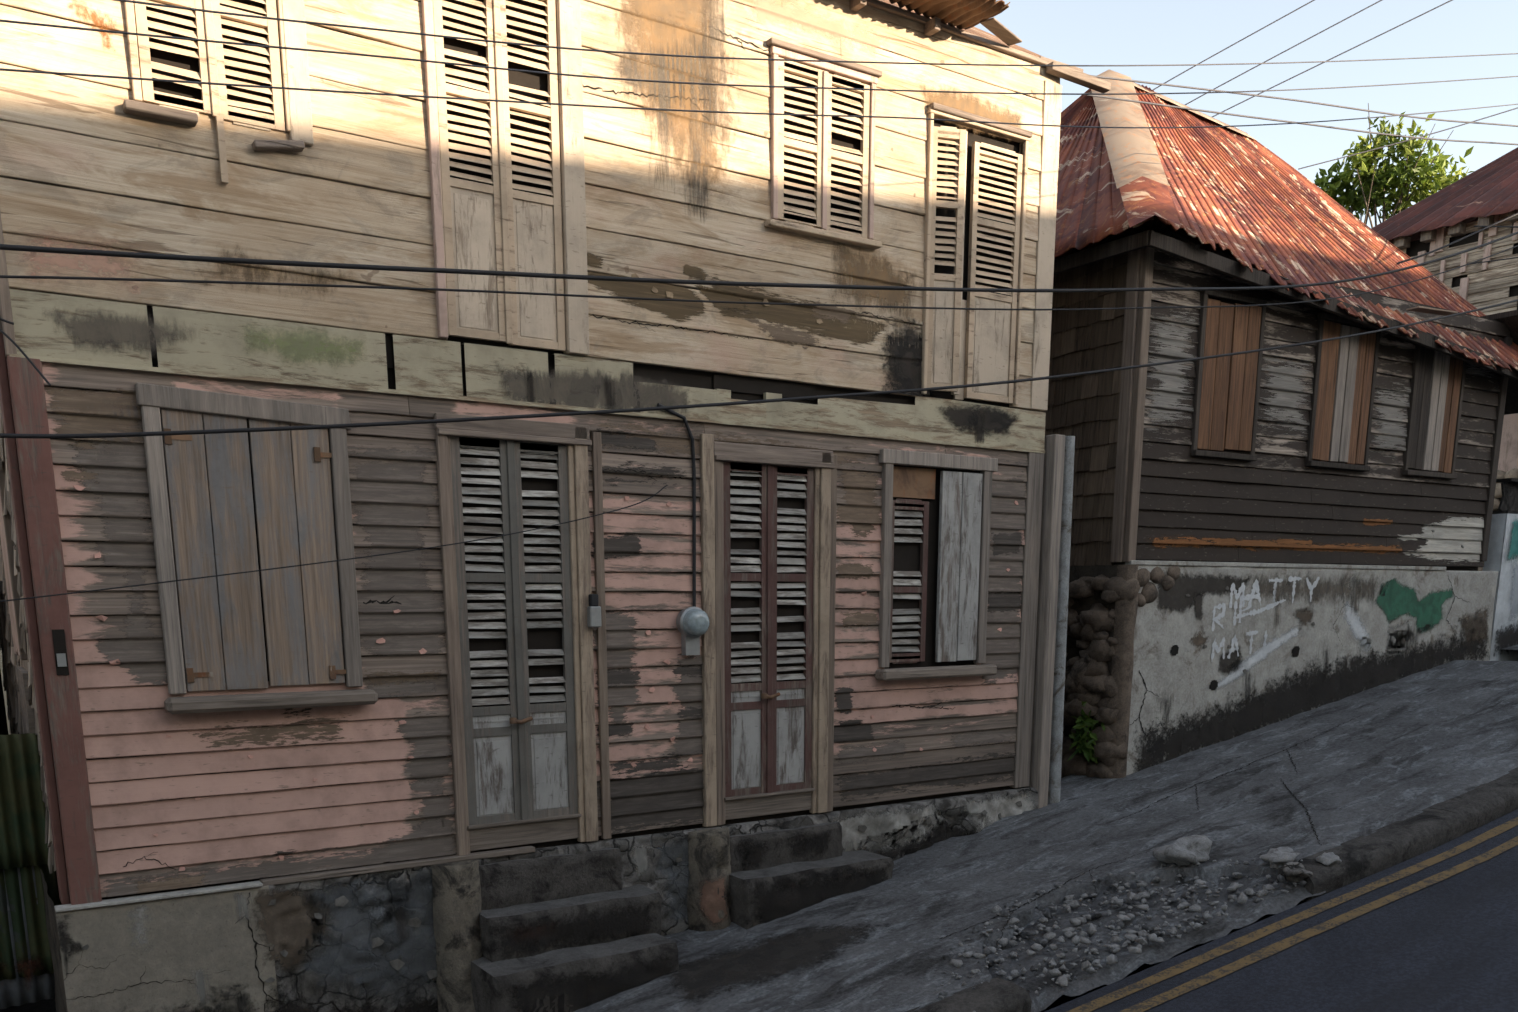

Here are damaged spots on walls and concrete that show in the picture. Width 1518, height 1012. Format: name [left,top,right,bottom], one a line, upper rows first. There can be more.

water stain [618,0,730,218]
water stain [682,243,1018,442]
peeling [101,444,457,983]
peeling [593,611,704,835]
water stain [1133,624,1518,773]
water stain [167,970,439,1012]
flaking render [699,877,728,924]